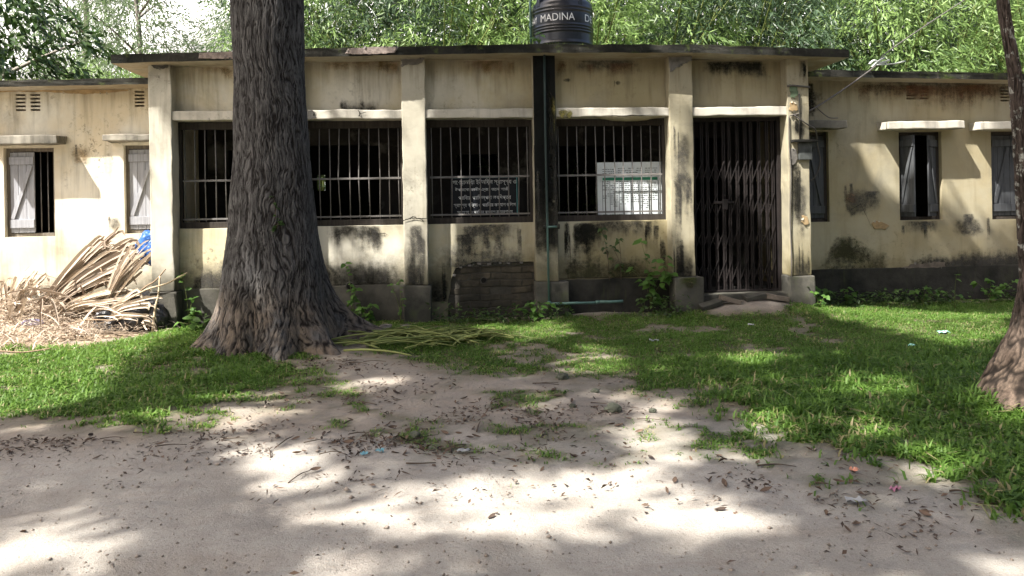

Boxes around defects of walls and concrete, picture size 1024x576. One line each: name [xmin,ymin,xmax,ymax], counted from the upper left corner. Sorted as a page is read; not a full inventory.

water stain [533,56,693,288]
water stain [328,224,521,302]
mould [958,214,990,234]